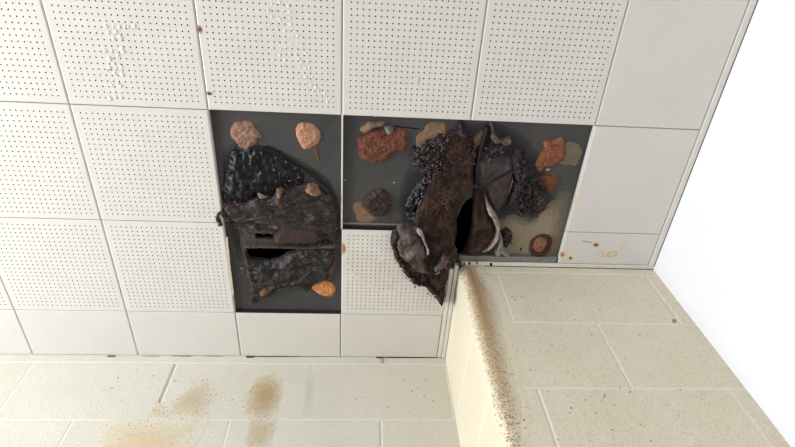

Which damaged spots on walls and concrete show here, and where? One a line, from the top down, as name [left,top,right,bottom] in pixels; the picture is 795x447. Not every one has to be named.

spalling [434,120,477,179]
water stain [460,266,532,447]
water stain [94,379,217,447]
water stain [242,372,284,447]